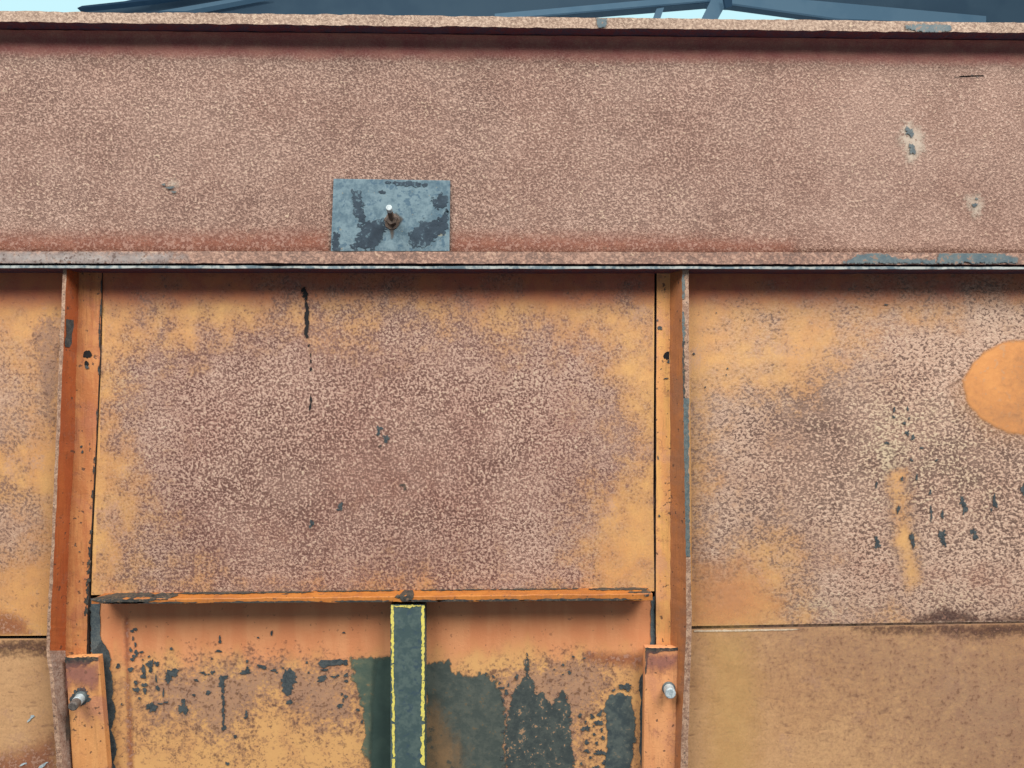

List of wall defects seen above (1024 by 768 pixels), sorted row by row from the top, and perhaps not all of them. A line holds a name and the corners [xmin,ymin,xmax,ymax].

peeling [898,121,925,162]
peeling [332,189,387,250]
peeling [378,180,449,248]
peeling [843,253,1019,265]
corrosion [0,316,60,575]
corrosion [96,273,654,593]
corrosion [691,274,1024,767]
peeling [929,489,947,547]
corrosion [0,745,51,768]
corrosion [127,644,364,768]
peeling [65,529,678,768]
corrosion [487,650,678,768]